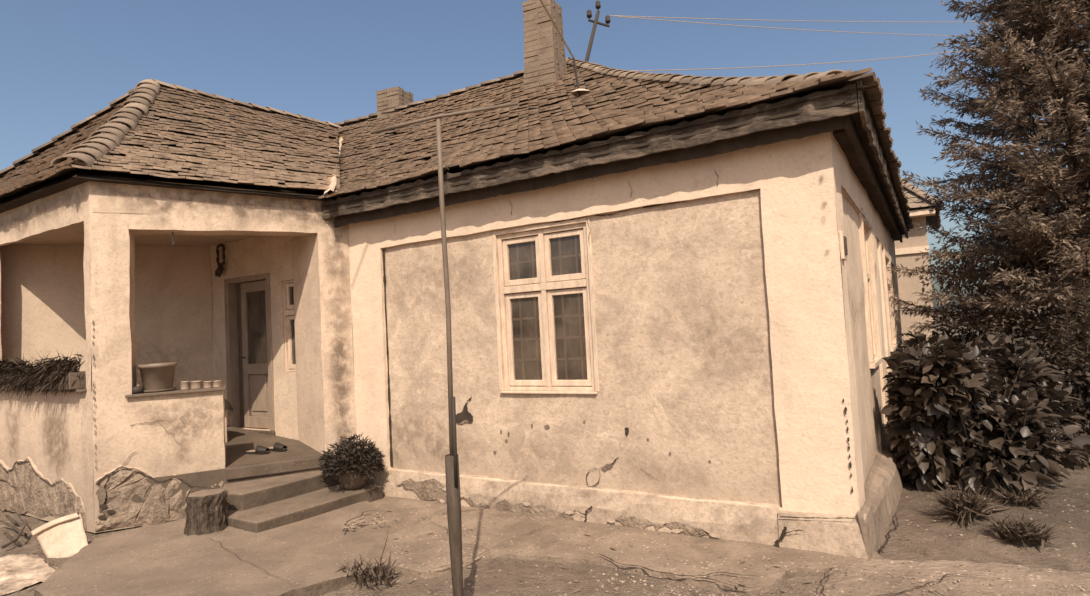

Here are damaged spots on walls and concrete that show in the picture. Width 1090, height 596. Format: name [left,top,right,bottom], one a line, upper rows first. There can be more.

spalling [456,396,473,424]
spalling [0,383,225,532]
spalling [396,479,447,503]
spalling [460,494,574,520]
crack [774,516,854,548]